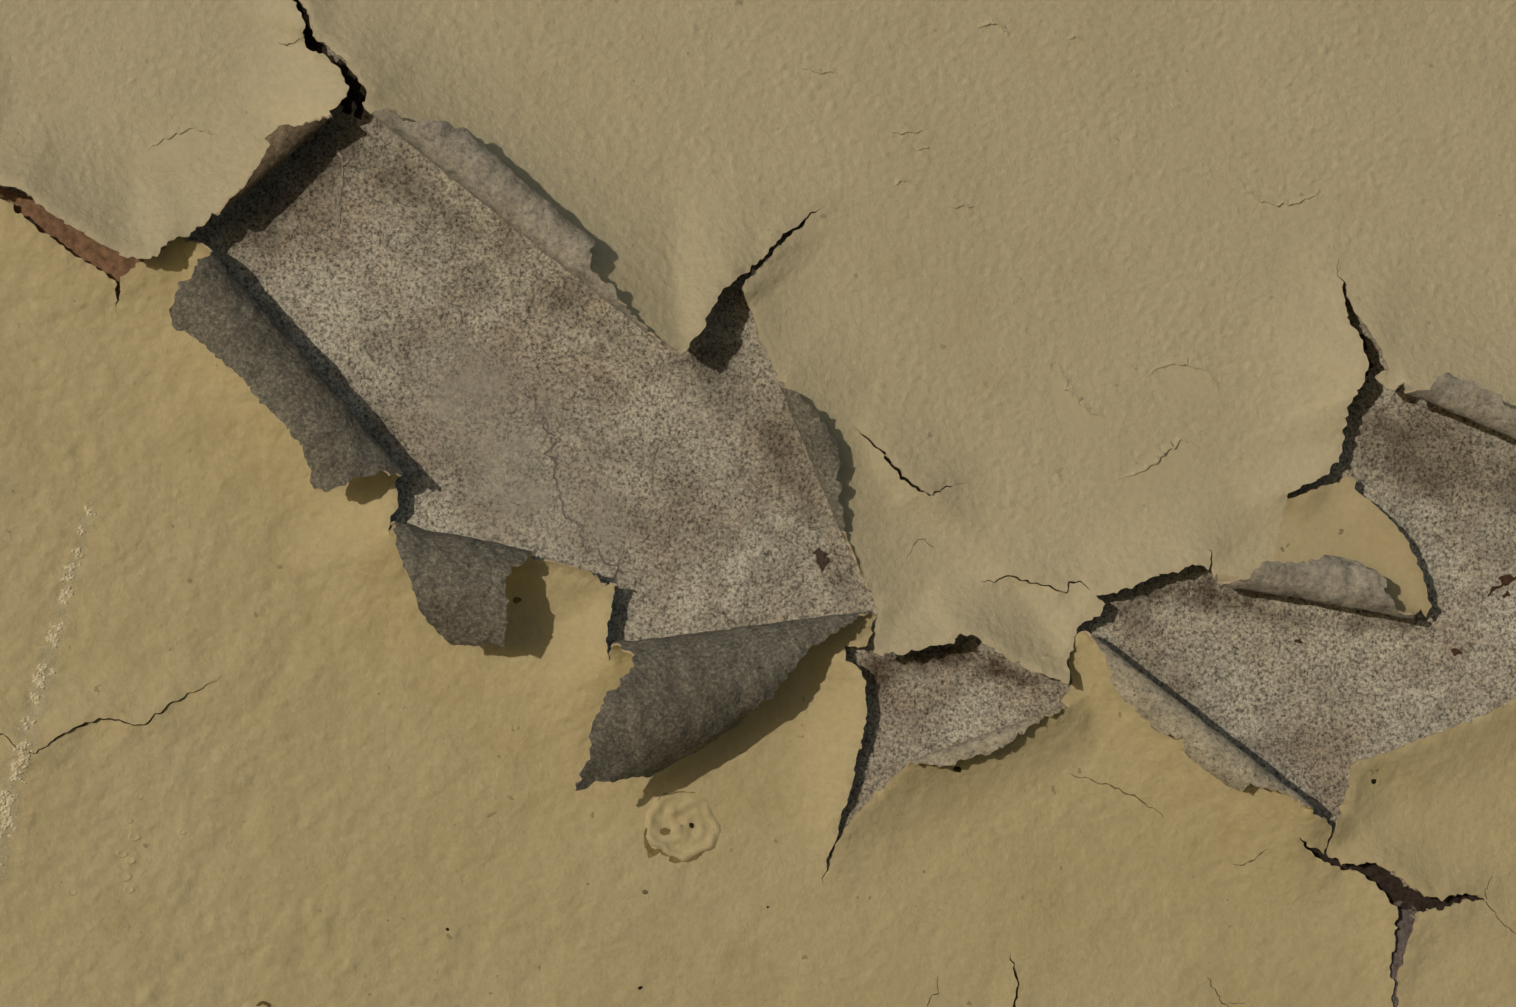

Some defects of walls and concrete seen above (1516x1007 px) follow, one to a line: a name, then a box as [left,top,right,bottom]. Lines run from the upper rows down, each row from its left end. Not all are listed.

peeling [135,122,217,171]
crack [1345,302,1374,376]
peeling [169,87,1072,871]
peeling [1076,360,1516,849]
crack [0,680,218,754]
crack [1233,836,1516,1007]
crack [1010,959,1019,1007]